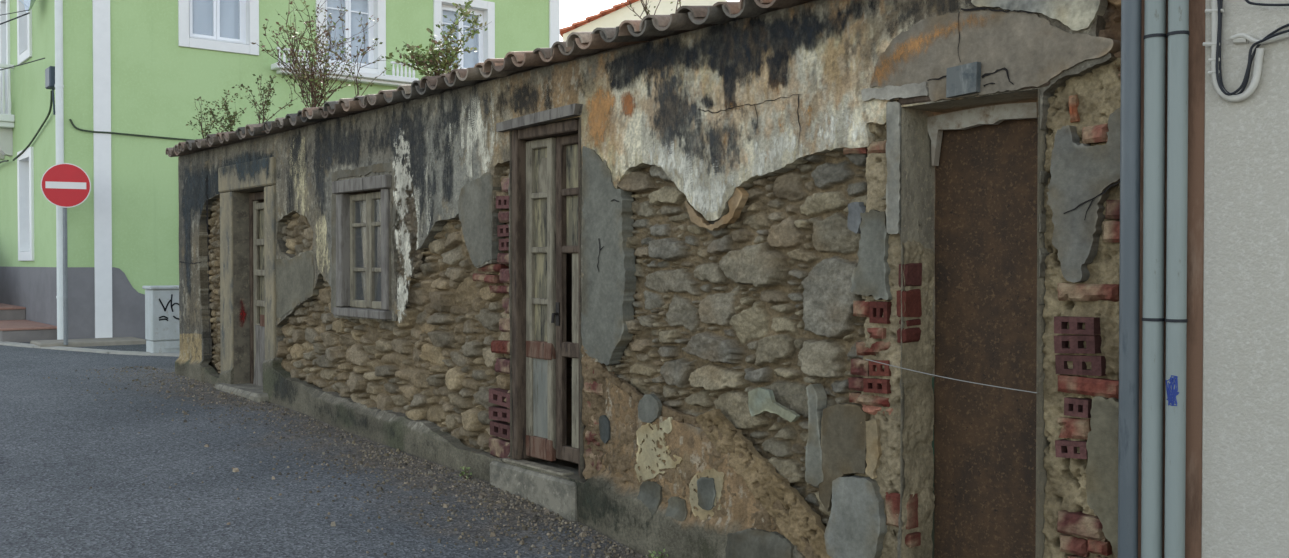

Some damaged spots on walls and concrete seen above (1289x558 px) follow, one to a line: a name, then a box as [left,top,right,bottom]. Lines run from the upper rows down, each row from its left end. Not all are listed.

spalling [207,198,221,373]
leakage [180,86,497,323]
spalling [276,164,510,458]
leakage [605,0,875,213]
crack [700,94,800,142]
spalling [581,123,935,558]
crack [927,7,1033,87]
spalling [971,0,1121,558]